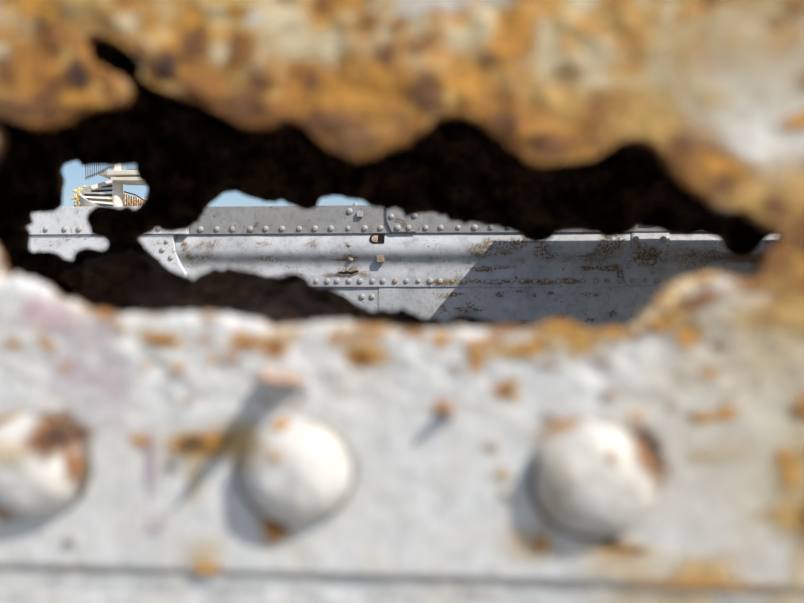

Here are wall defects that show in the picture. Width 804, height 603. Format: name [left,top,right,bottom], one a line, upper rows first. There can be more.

peeling [212,44,231,64]
peeling [247,0,342,58]
peeling [395,0,468,17]
peeling [534,22,610,73]
corrosion [0,0,804,329]
peeling [624,272,720,333]
corrosion [146,333,176,346]
corrosion [232,328,296,356]
corrosion [347,341,384,366]
corrosion [454,316,594,374]
corrosion [494,381,517,398]
corrosion [27,413,93,499]